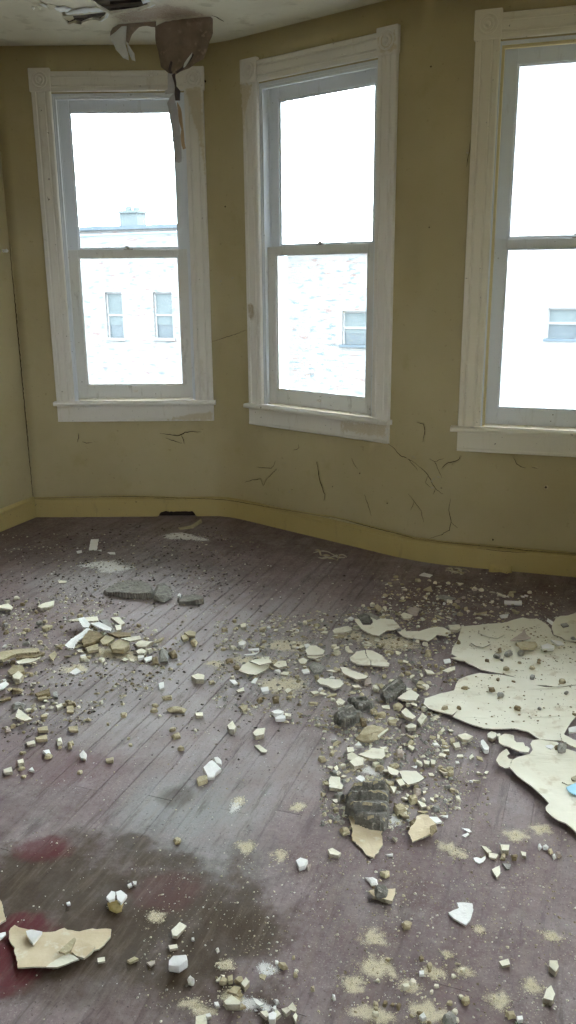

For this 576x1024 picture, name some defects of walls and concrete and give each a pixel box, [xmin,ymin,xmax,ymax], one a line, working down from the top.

peeling [32,0,125,22]
crack [10,247,575,554]